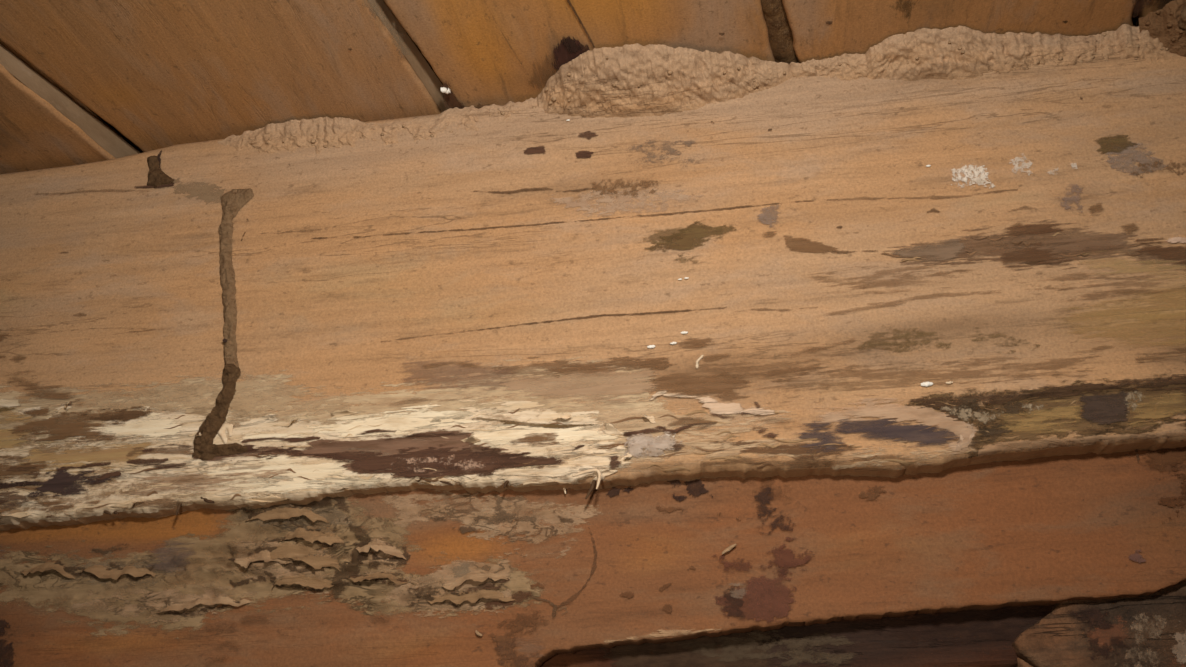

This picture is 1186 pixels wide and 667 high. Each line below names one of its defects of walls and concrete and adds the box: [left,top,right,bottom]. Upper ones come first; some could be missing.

water stain [645,221,736,257]
peeling [815,398,979,470]
peeling [0,355,818,636]
water stain [0,620,15,667]